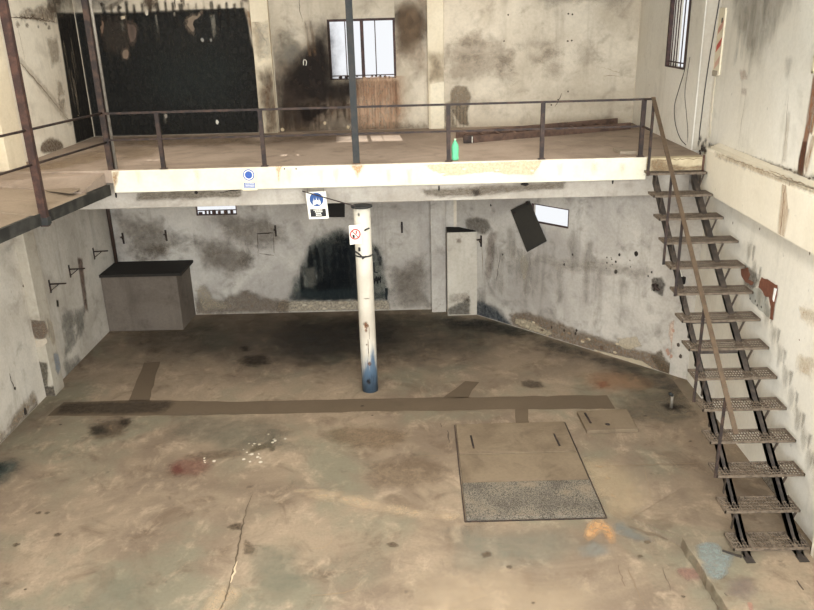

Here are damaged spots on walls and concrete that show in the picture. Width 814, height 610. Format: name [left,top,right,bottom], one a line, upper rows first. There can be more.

damp [450,86,471,127]
corrosion [797,76,814,176]
peeling [429,161,540,186]
spalling [741,268,778,320]
crack [219,494,254,610]